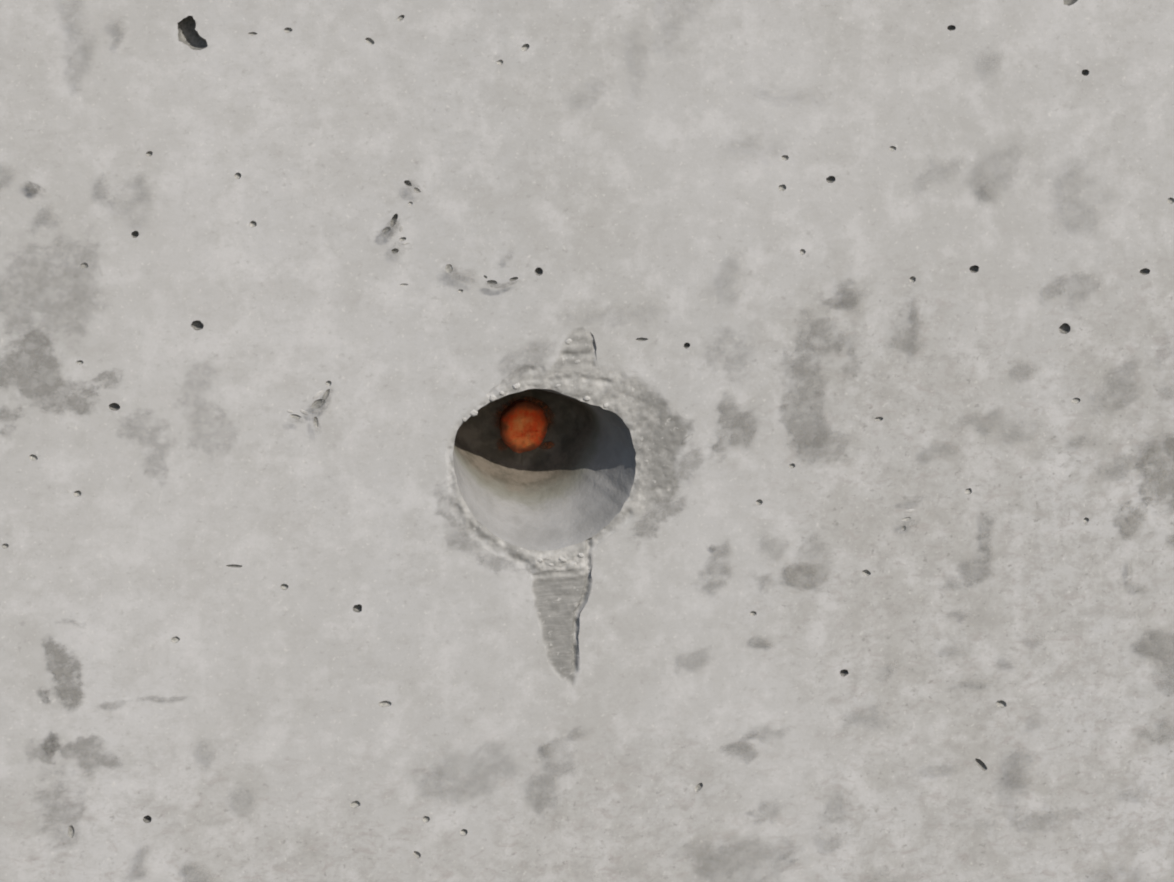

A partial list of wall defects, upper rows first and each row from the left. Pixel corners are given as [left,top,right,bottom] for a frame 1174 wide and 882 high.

spalling [443,326,696,573]